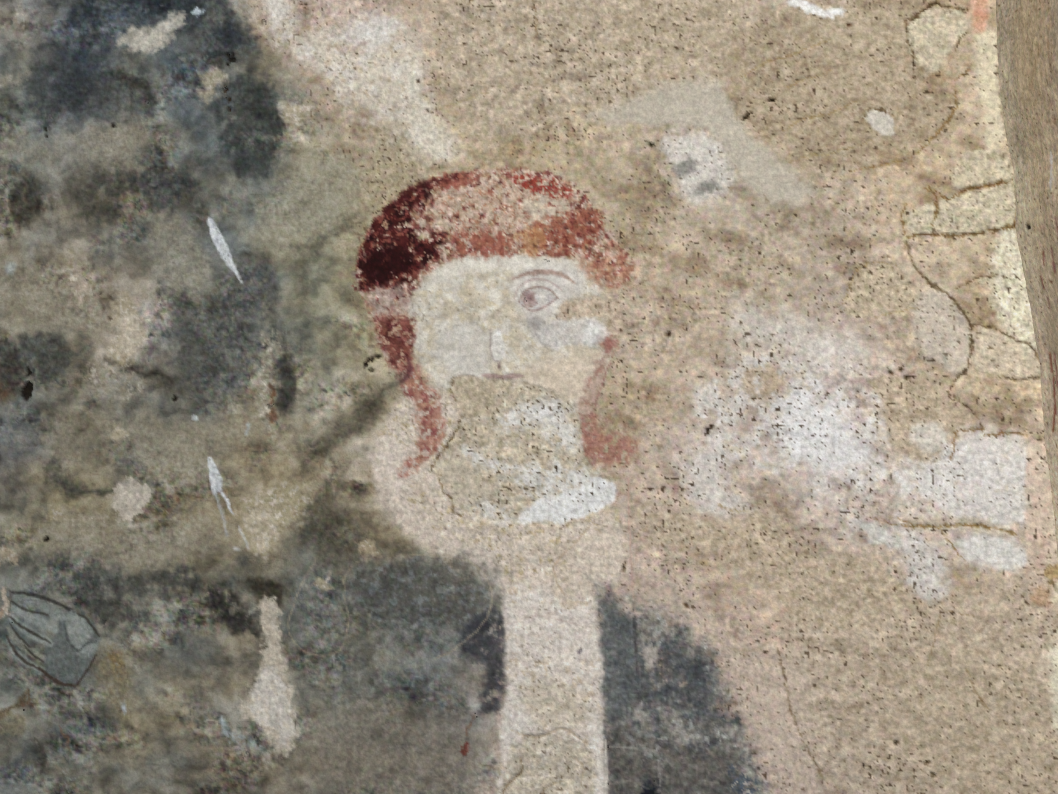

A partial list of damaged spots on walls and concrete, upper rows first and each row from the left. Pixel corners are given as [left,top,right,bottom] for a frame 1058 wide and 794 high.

damp [0,0,164,192]
crack [848,0,971,174]
damp [0,247,112,349]
damp [134,203,227,310]
crack [839,176,1041,462]
damp [0,386,279,591]